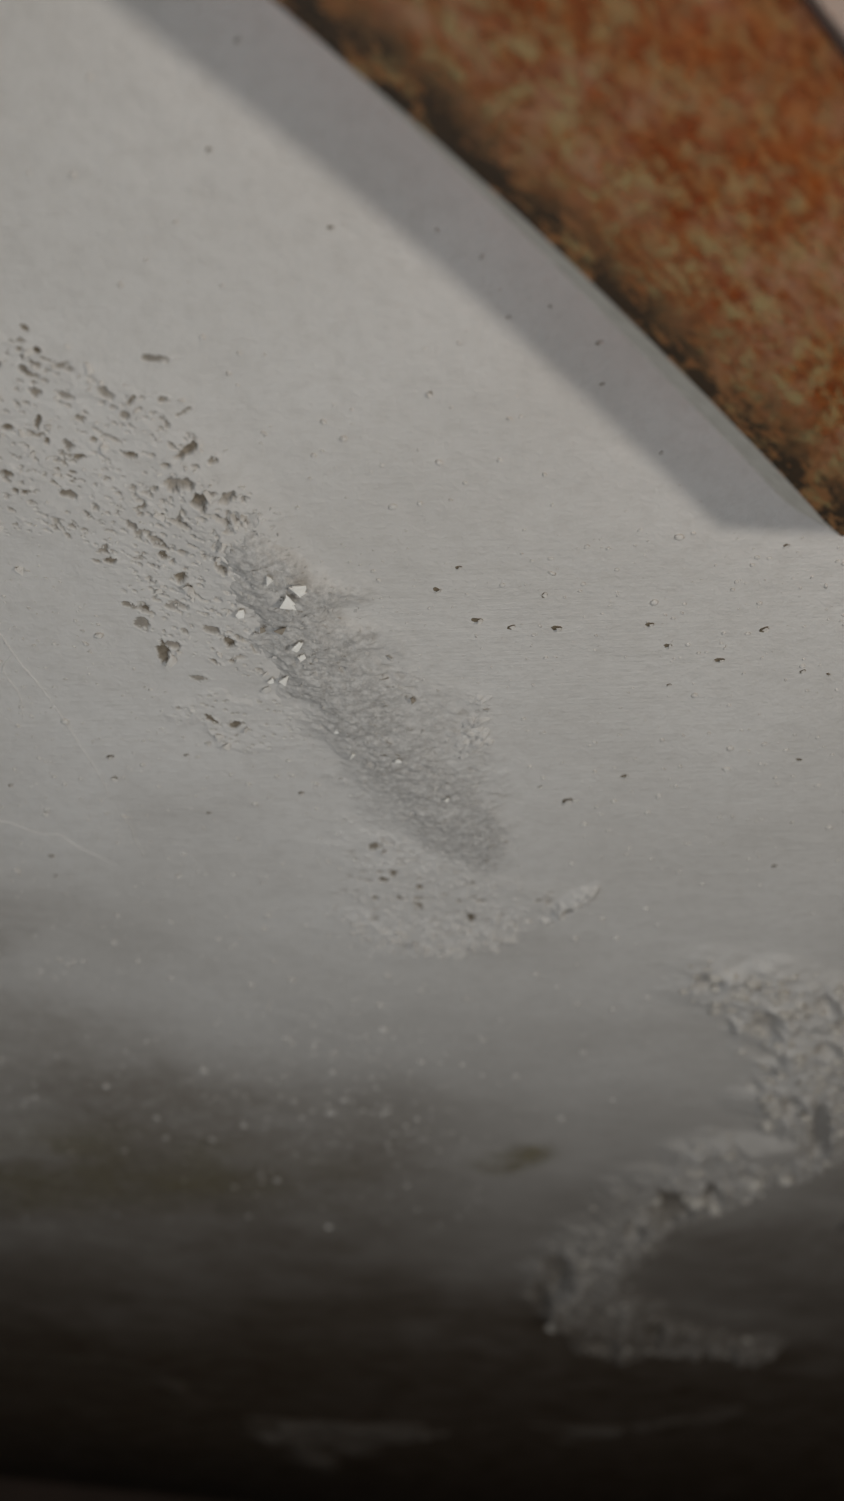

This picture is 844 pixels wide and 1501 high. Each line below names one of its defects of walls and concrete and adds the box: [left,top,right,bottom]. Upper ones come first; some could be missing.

spalling [0,286,308,757]
spalling [304,805,603,967]
flaking render [504,941,844,1368]